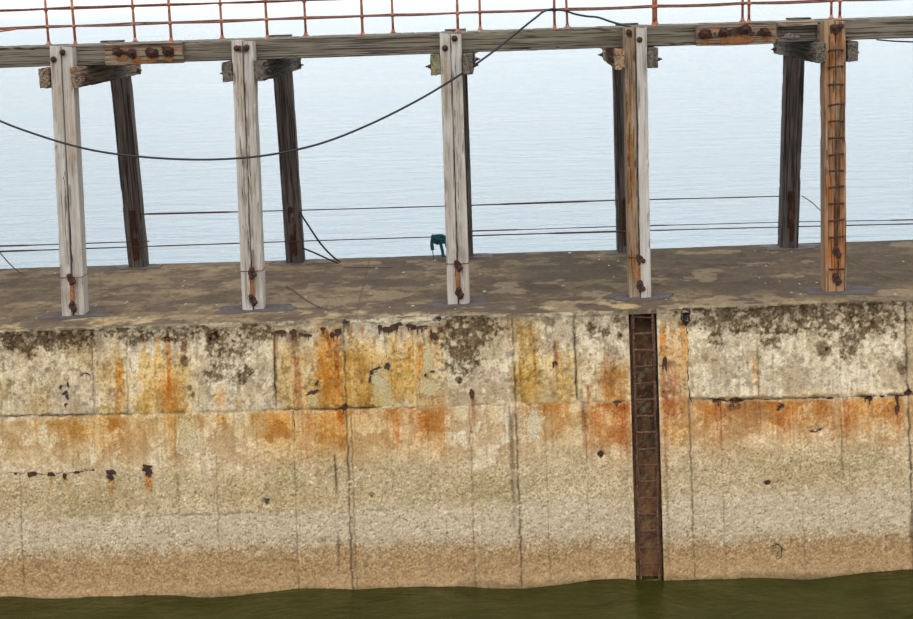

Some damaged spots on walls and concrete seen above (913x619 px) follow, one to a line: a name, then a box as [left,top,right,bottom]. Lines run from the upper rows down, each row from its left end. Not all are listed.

leakage [0,329,94,357]
leakage [105,323,272,384]
corrosion [274,327,341,342]
corrosion [378,322,437,341]
leakage [430,316,508,383]
leakage [675,300,905,358]
crack [3,469,116,481]
crack [142,464,153,477]